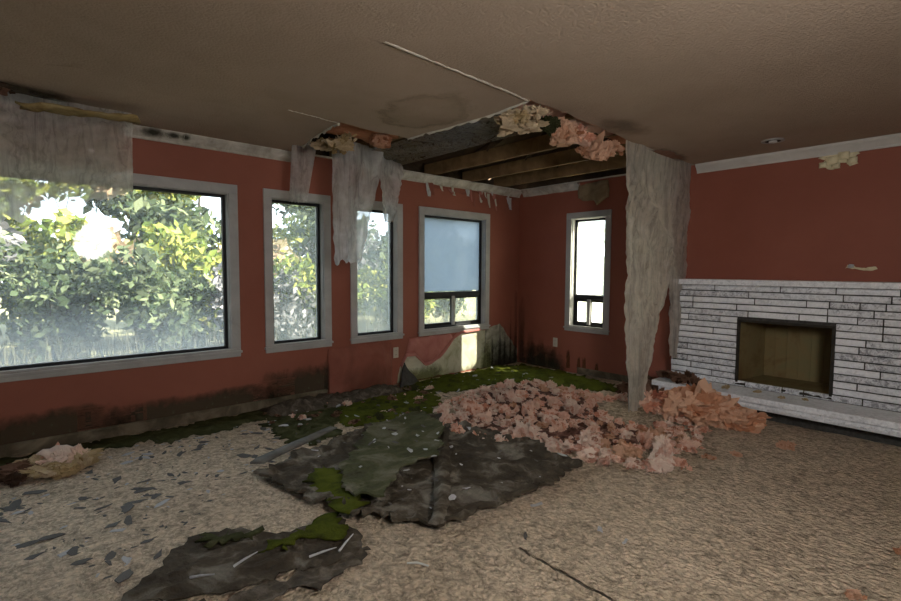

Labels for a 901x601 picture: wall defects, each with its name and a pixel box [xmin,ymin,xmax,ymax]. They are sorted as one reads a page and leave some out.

flaking render [818,151,860,170]
peeling [397,328,485,387]
mould [481,324,563,370]
leakage [0,368,328,445]